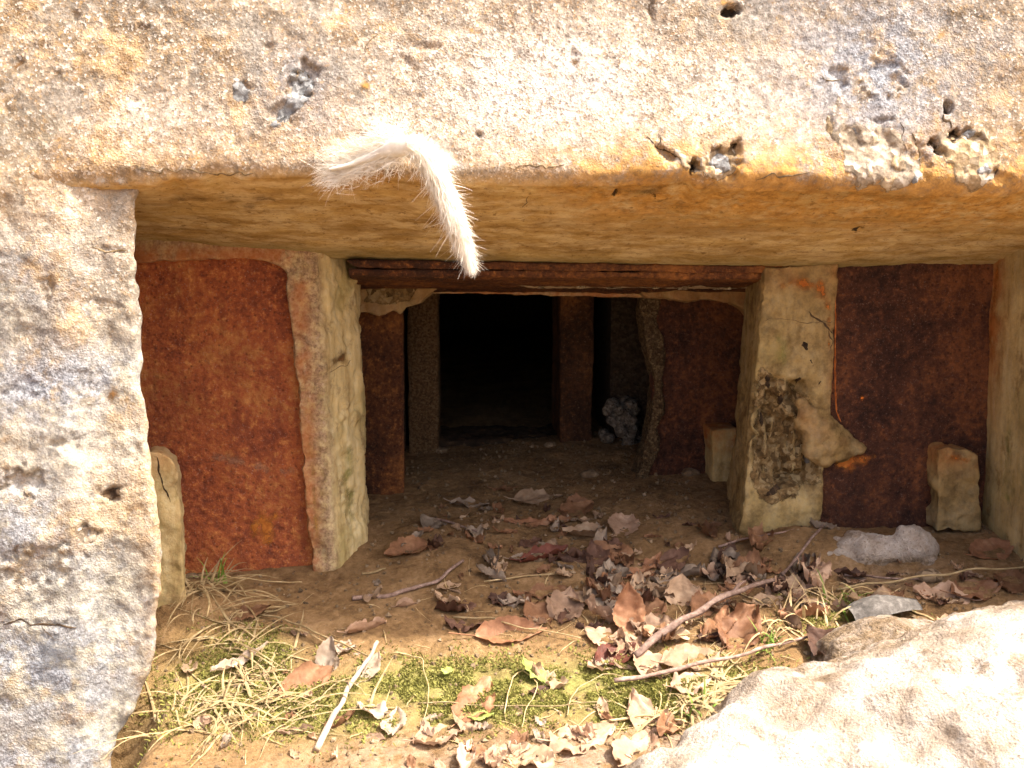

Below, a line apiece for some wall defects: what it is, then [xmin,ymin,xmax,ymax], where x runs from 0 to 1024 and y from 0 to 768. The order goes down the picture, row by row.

spalling [672,143,740,181]
spalling [825,115,923,193]
spalling [929,130,1001,193]
spalling [750,368,822,505]
crack [157,458,171,503]